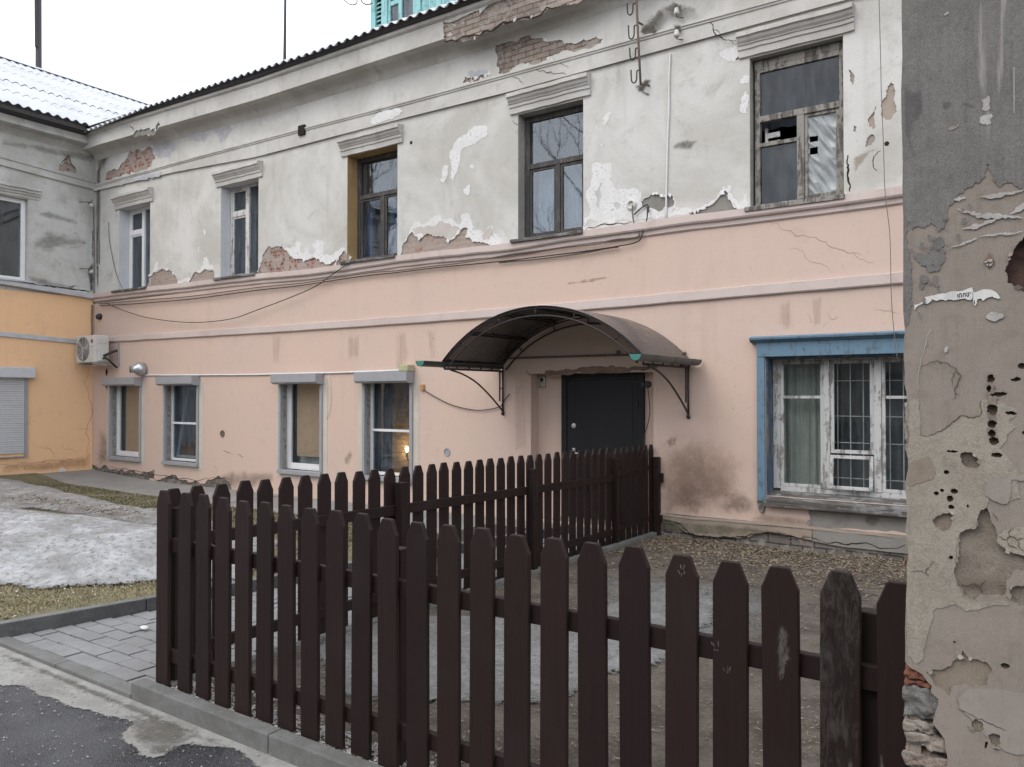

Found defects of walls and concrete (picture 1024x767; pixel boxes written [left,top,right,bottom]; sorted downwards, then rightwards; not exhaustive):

spalling [464,35,602,83]
peeling [371,108,403,125]
spalling [866,83,897,147]
spalling [59,155,76,173]
spalling [106,125,232,186]
peeling [440,125,488,183]
peeling [583,162,749,230]
spalling [148,247,216,286]
spalling [257,240,352,273]
spalling [401,213,504,255]
crack [777,223,873,271]
peeling [901,373,1024,767]